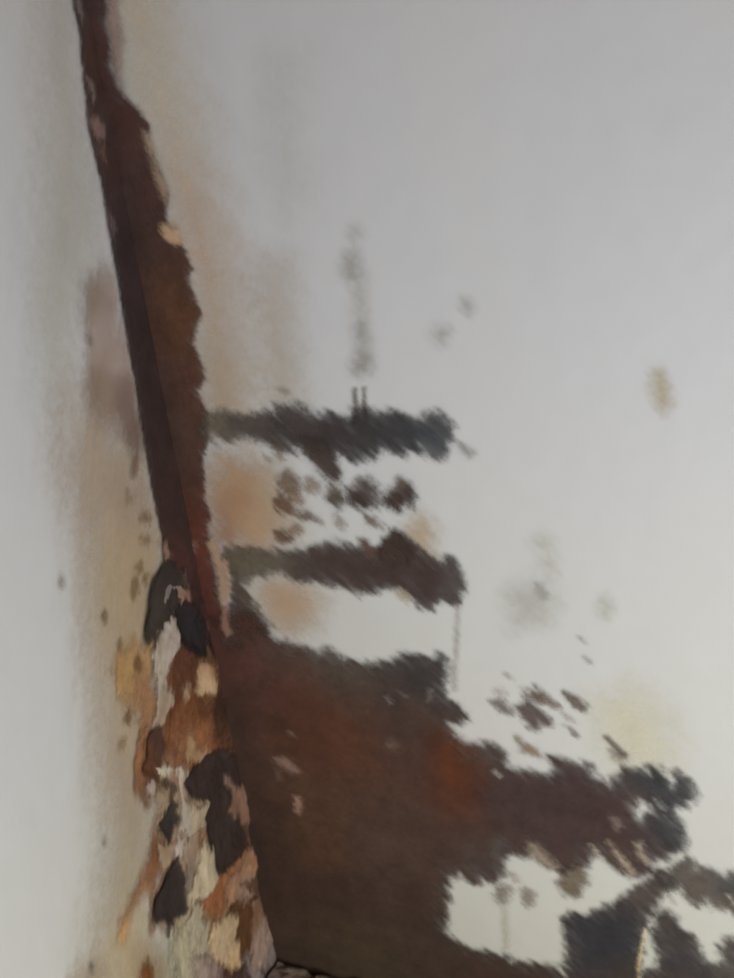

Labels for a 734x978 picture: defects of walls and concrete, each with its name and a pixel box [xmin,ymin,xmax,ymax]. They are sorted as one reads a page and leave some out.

leakage [74,0,454,978]
flaking render [134,542,277,978]
leakage [207,532,734,978]